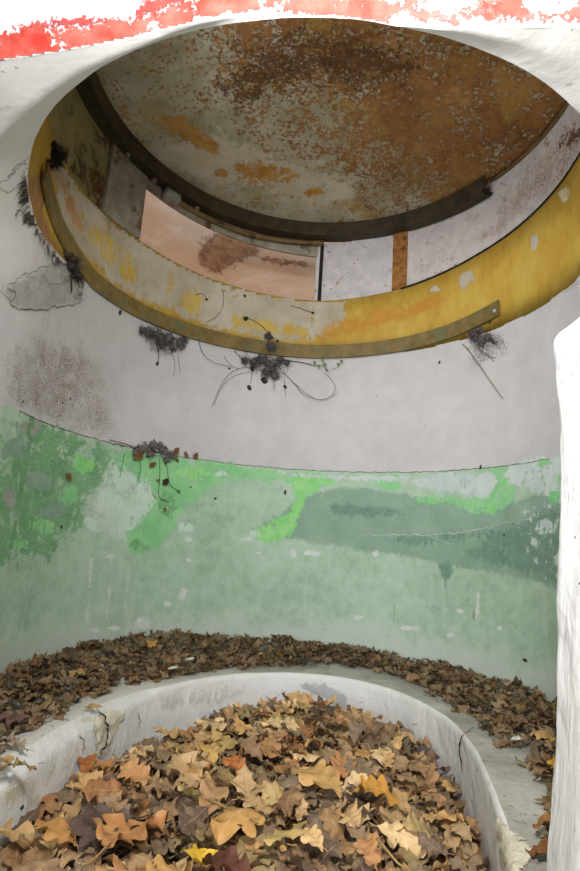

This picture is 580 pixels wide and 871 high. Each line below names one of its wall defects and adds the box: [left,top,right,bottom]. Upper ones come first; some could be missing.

peeling [0,0,580,60]
corrosion [205,17,423,121]
corrosion [160,114,226,158]
corrosion [214,158,301,189]
corrosion [303,187,326,198]
corrosion [481,116,580,241]
peeling [559,186,570,203]
water stain [0,332,130,454]
peeling [0,415,561,589]
spalling [493,816,532,871]